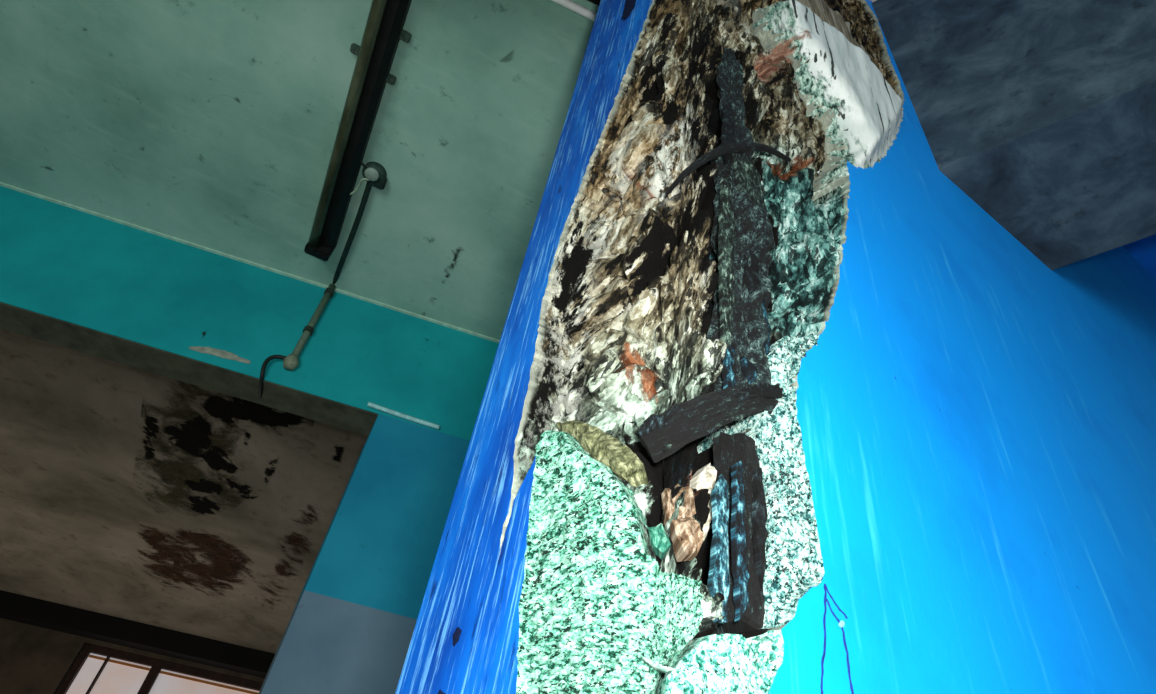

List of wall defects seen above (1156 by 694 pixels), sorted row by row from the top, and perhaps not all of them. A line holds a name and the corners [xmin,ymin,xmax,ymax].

spalling [498,0,905,694]
water stain [135,381,315,514]
water stain [333,445,344,462]
crack [820,584,854,694]